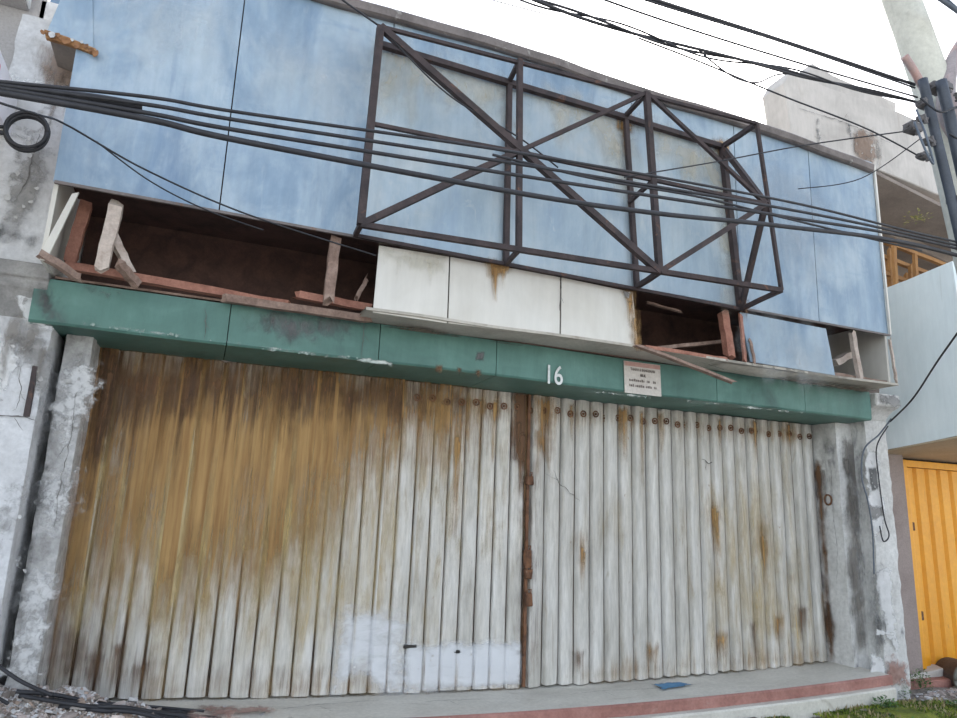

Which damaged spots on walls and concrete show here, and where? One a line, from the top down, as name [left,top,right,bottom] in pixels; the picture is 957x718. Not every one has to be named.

corrosion [488,263,510,296]
crack [0,367,34,429]
flaking render [0,295,102,444]
crack [54,393,77,525]
corrosion [48,347,498,677]
corrosion [711,508,719,541]
corrosion [814,463,835,654]
damp [845,440,885,648]